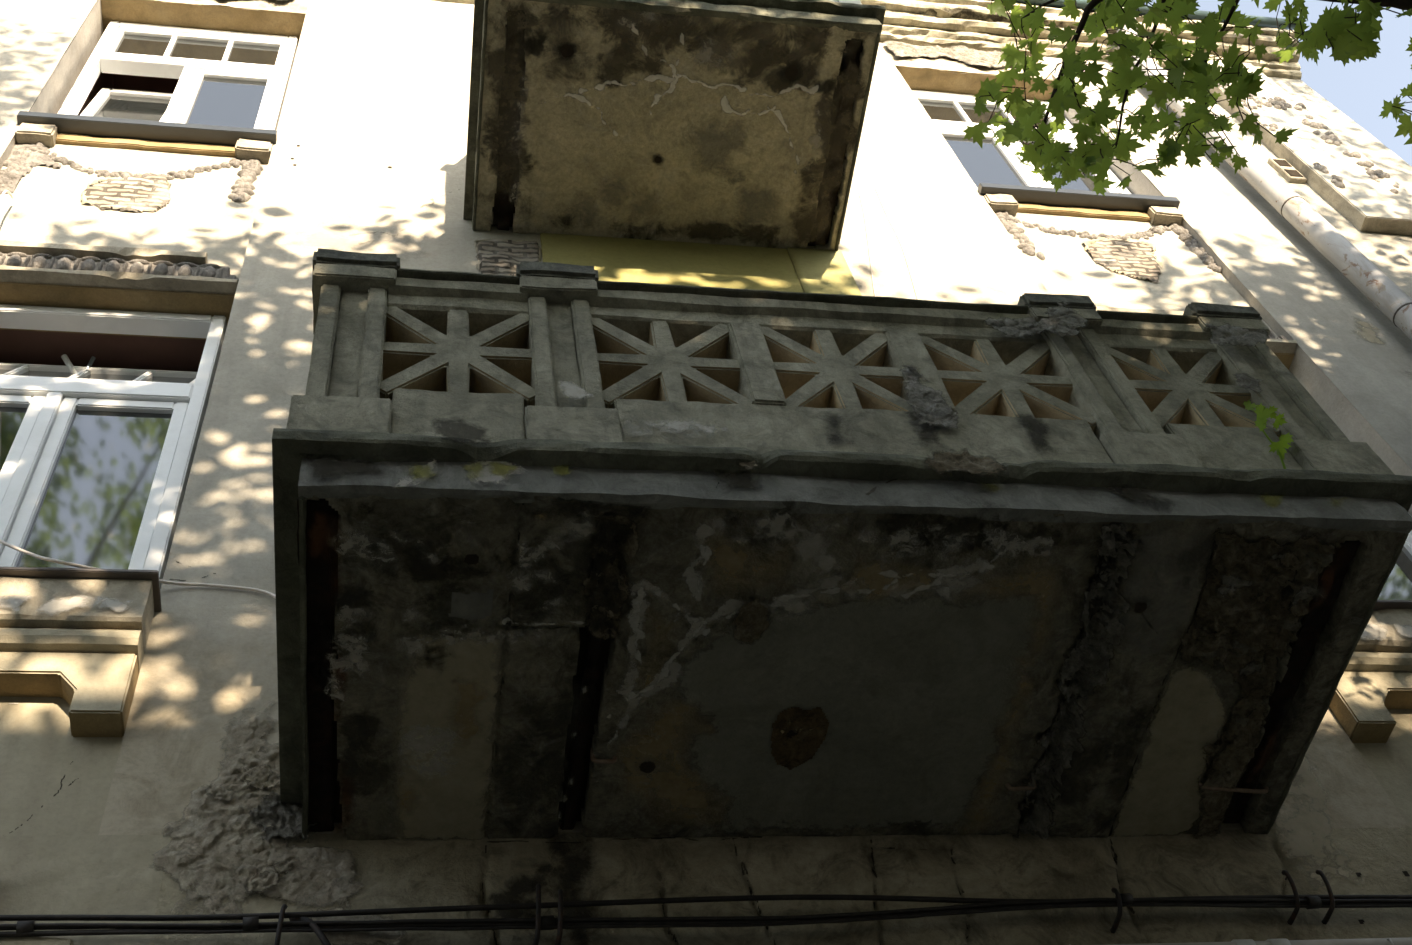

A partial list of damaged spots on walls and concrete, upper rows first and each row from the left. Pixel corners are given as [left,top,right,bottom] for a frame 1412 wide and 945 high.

damp [482,0,866,248]
damp [337,498,647,666]
damp [845,505,1081,566]
spalling [154,699,403,945]
damp [326,586,389,795]
rust [771,707,829,770]
peeling [1112,667,1226,837]